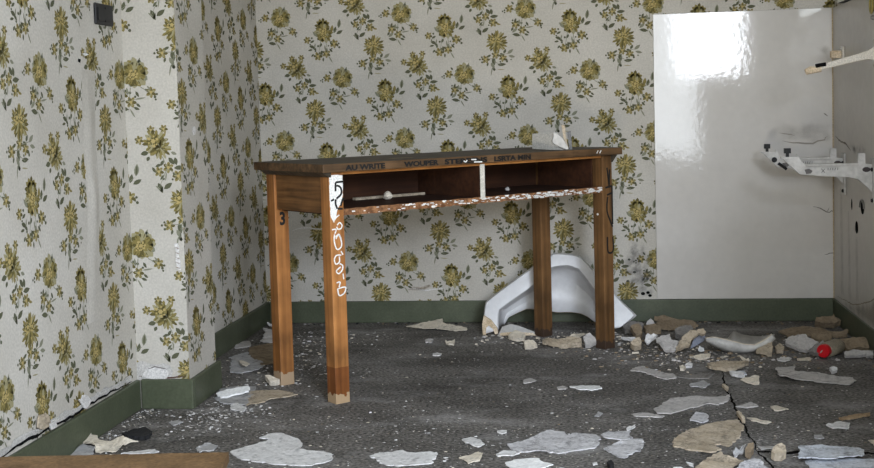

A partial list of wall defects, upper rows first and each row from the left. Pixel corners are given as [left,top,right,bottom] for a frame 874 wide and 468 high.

crack [722,371,800,468]